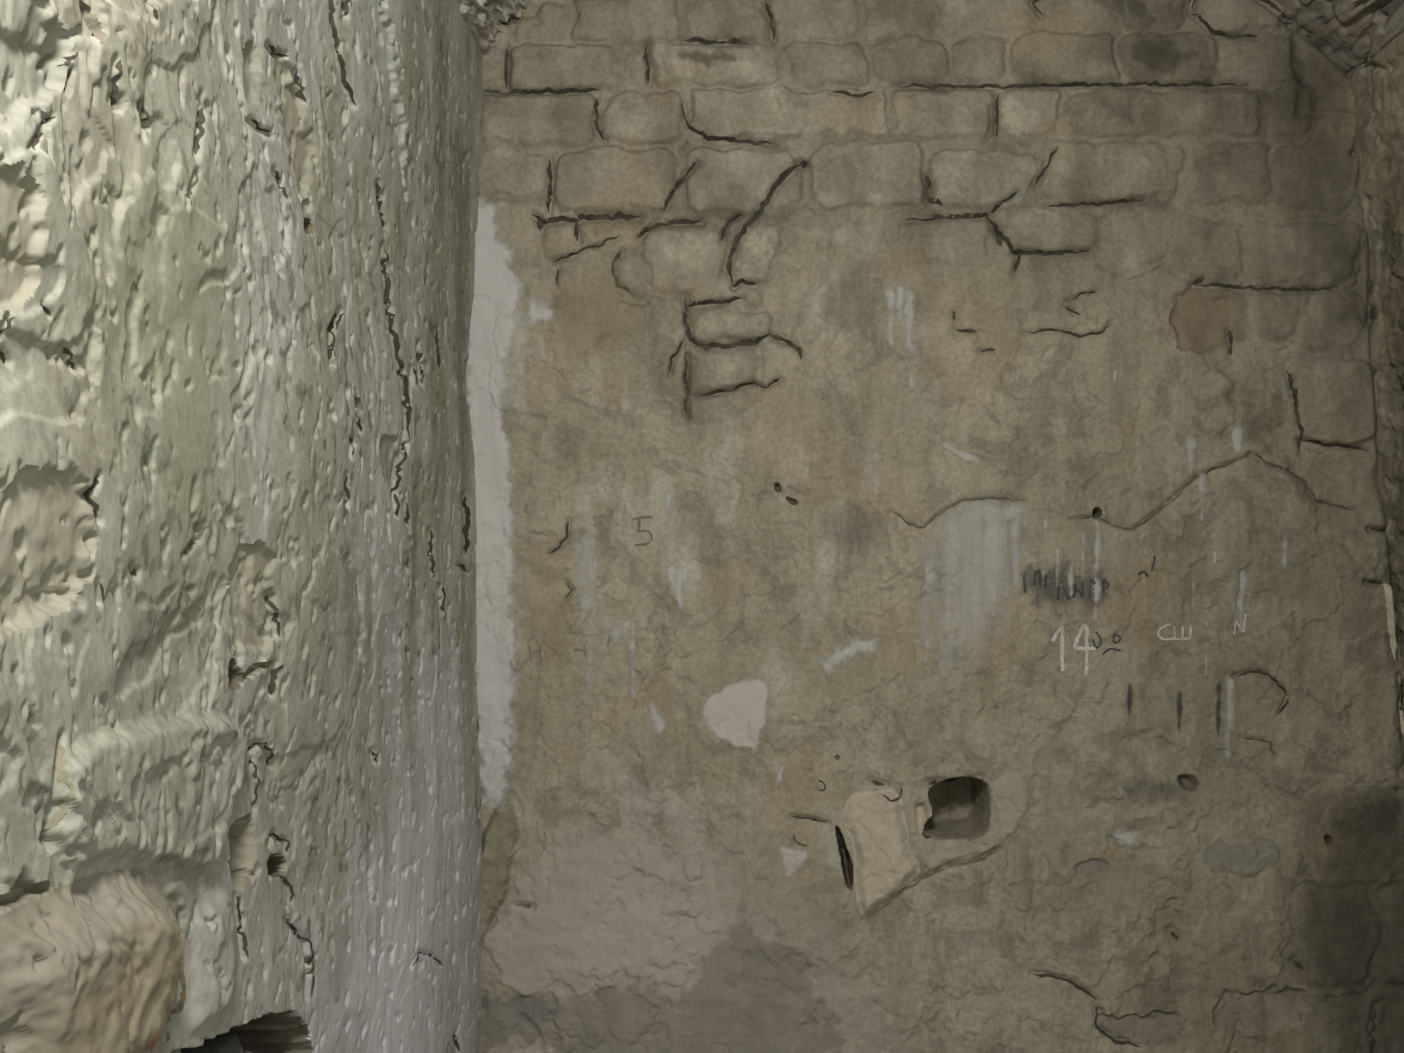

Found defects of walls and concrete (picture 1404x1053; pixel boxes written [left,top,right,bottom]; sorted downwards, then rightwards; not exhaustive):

crack [329,0,356,105]
crack [484,49,604,140]
crack [531,102,808,416]
crack [906,147,1143,272]
crack [1027,291,1110,338]
crack [1075,371,1385,532]
crack [265,596,284,694]
leakage [346,143,552,1053]
crack [270,833,315,997]
leakage [526,858,851,1053]
spalling [835,825,854,891]
spalling [911,771,1027,868]